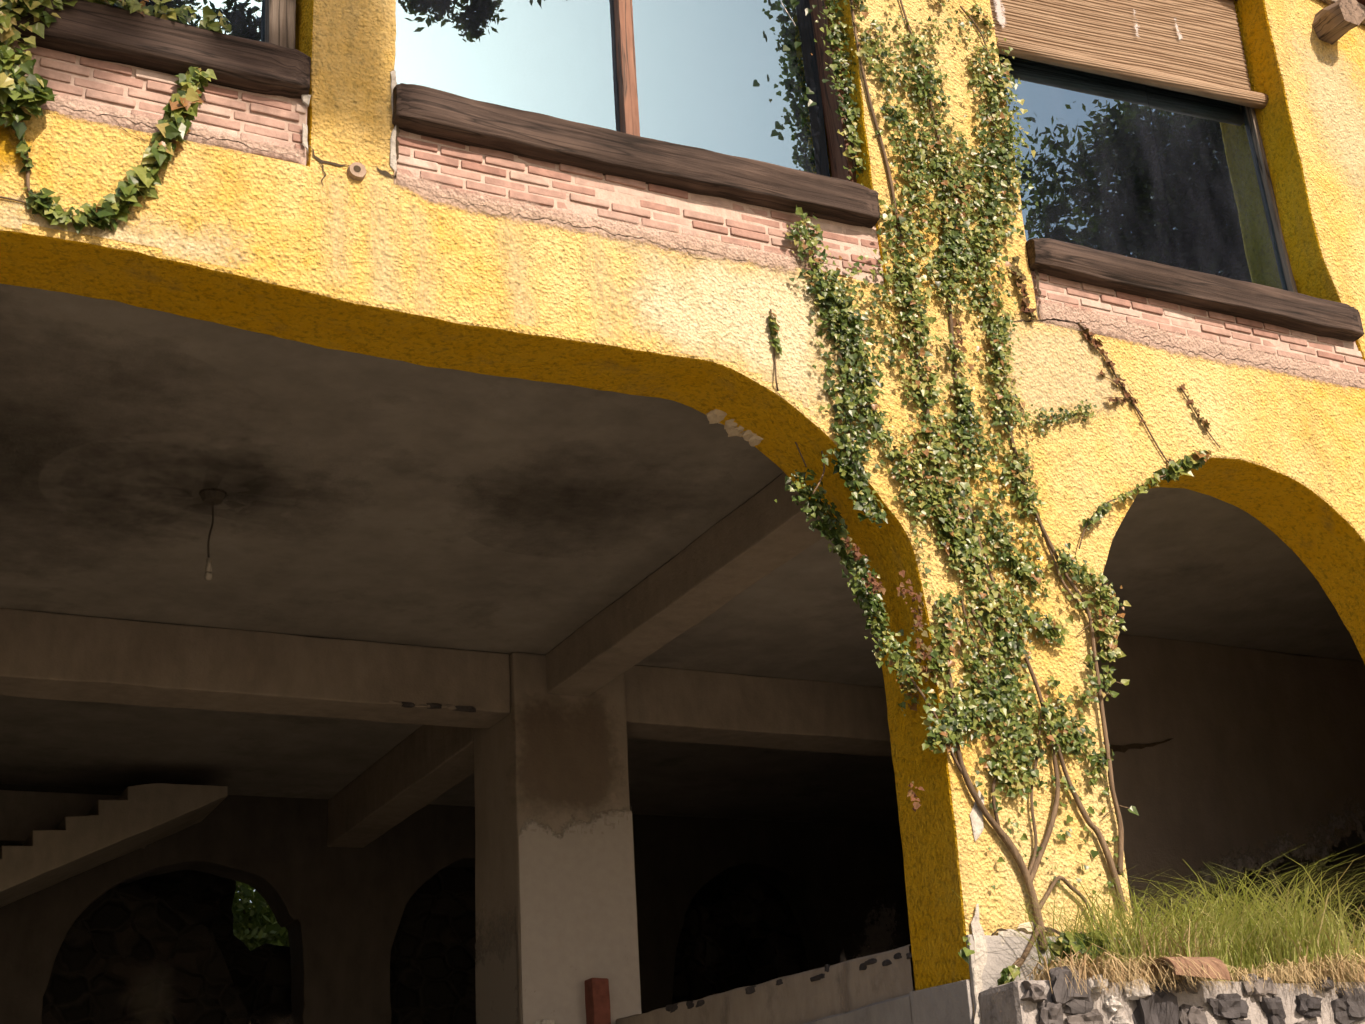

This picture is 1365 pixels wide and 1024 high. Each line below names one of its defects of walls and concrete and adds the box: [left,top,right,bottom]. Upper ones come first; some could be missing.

flaking render [706,409,763,447]
crack [1110,738,1173,753]